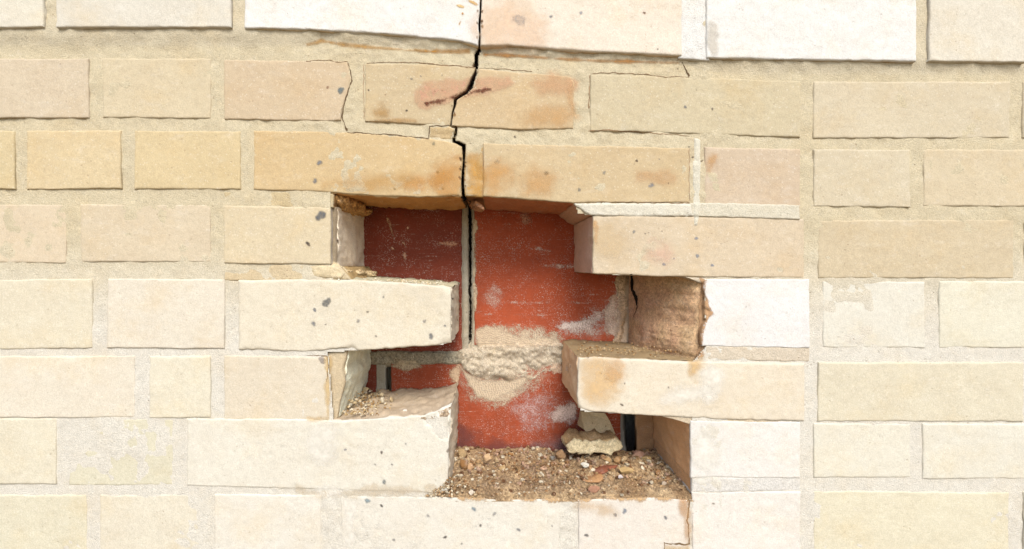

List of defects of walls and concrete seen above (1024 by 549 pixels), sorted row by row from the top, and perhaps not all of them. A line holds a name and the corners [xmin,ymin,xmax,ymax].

crack [306,3,532,341]
crack [585,62,690,204]
spalling [628,275,704,359]